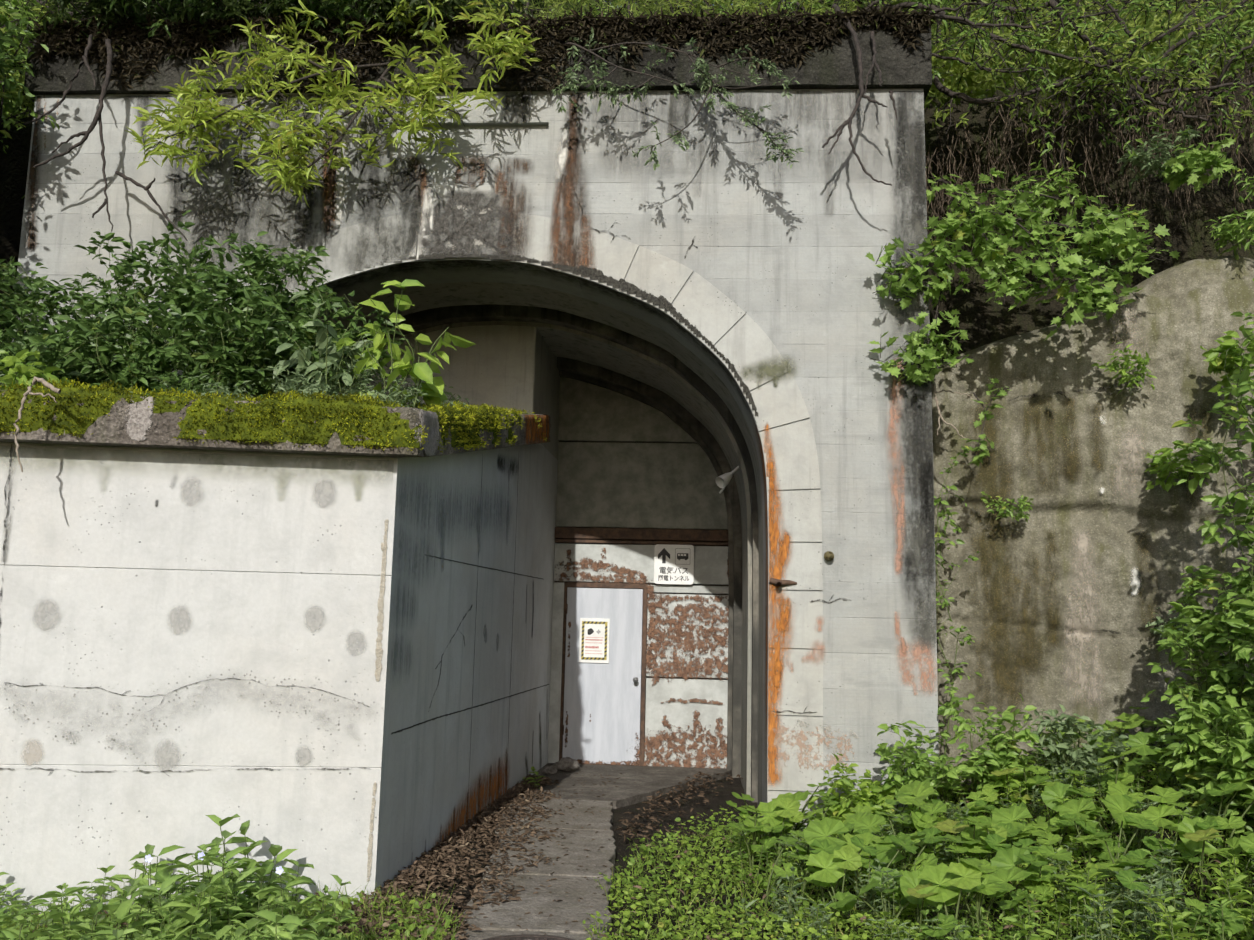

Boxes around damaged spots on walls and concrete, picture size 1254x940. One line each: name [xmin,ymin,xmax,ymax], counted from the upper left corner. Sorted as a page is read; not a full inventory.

water stain [127,91,793,407]
corrosion [552,93,592,273]
water stain [895,91,937,648]
corrosion [890,362,904,573]
corrosion [425,752,508,860]
corrosion [554,548,729,686]
corrosion [577,698,727,769]
corrosion [756,424,793,784]
corrosion [895,615,935,690]